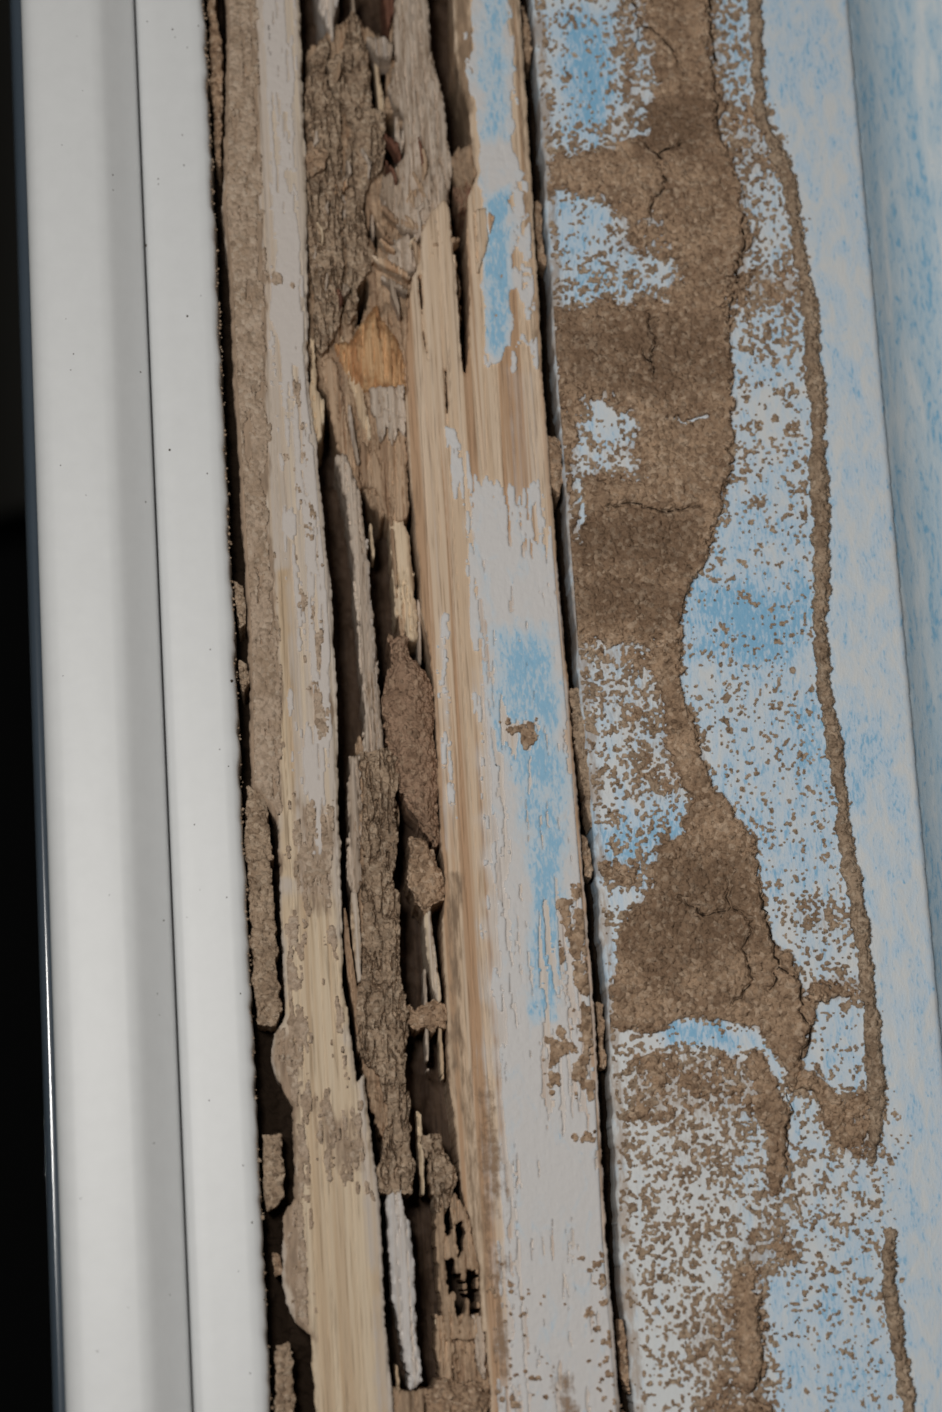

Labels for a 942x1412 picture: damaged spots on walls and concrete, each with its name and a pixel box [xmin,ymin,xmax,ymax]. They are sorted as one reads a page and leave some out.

peeling [463,0,539,374]
peeling [262,0,386,855]
spalling [355,748,457,1215]
peeling [436,612,458,819]
peeling [445,426,616,1412]